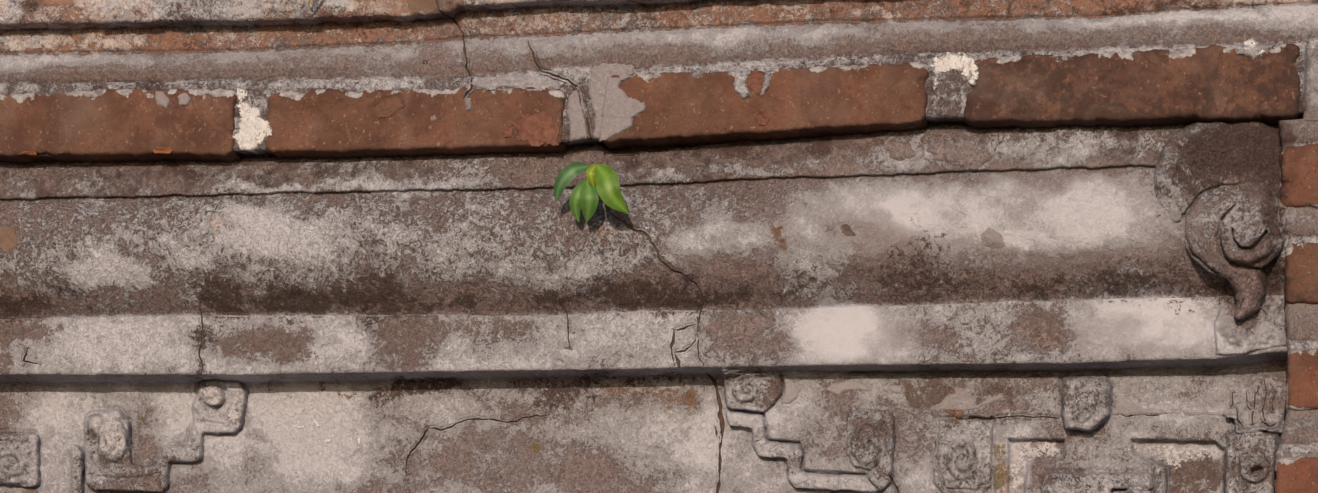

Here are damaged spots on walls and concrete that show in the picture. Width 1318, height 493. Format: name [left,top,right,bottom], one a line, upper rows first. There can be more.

crack [434,0,475,99]
peeling [464,63,646,146]
crack [609,212,727,493]
crack [403,413,550,493]